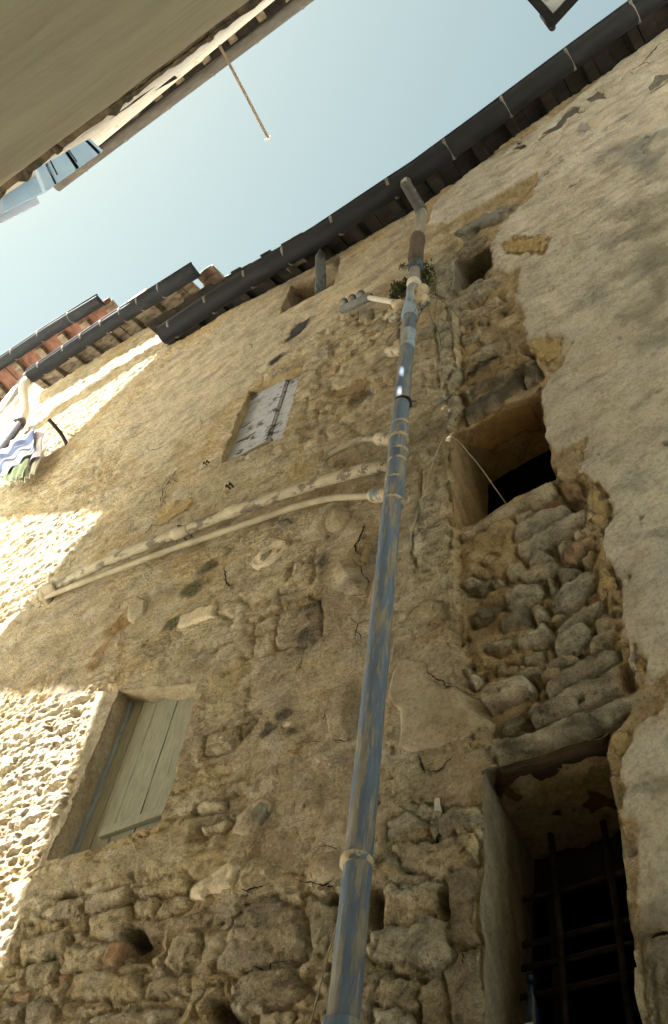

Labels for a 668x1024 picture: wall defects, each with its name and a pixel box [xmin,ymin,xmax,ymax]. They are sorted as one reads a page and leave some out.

spalling [503,235,547,254]
spalling [455,337,562,390]
crack [353,524,367,566]
spalling [599,572,616,592]
crack [427,671,471,695]
crack [418,754,455,773]